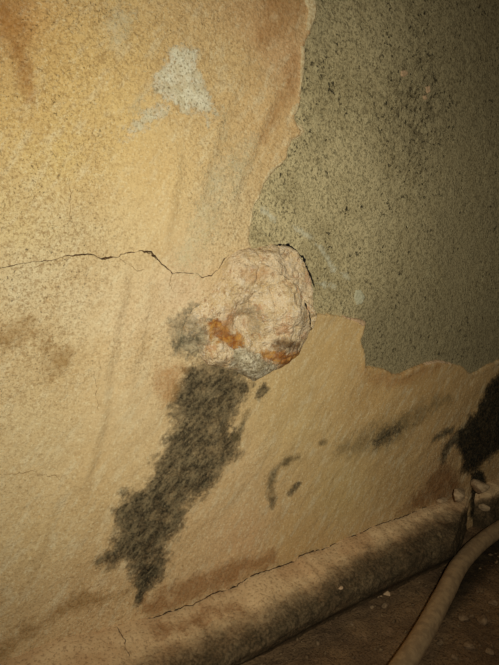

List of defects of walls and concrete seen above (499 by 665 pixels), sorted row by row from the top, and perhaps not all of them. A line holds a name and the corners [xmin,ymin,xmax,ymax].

spalling [248,0,499,374]
crack [4,250,229,293]
corrosion [208,318,245,349]
spalling [230,346,279,381]
corrosion [261,340,300,368]
water stain [96,303,269,607]
water stain [433,375,499,483]
crack [153,543,336,618]